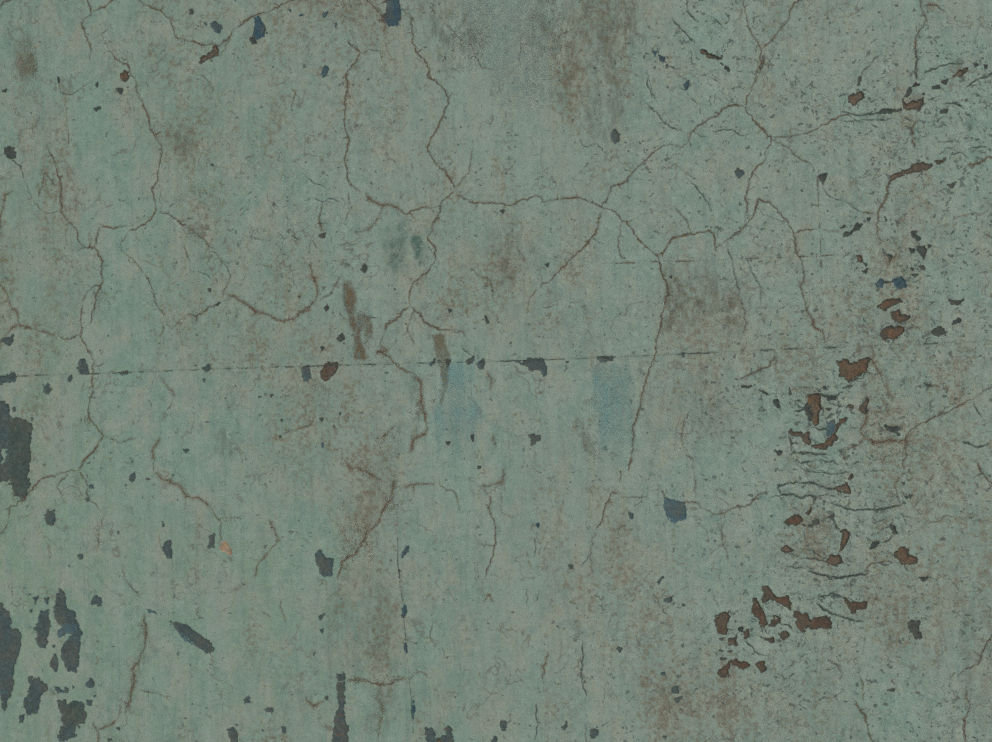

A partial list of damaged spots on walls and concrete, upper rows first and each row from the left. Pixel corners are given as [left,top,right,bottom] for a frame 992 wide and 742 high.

crack [0,0,192,528]
crack [147,0,992,626]
flaking render [875,230,931,341]
peeling [0,401,33,500]
flaking render [788,386,869,450]
peeling [0,603,22,711]
peeling [29,588,83,674]
peeling [19,676,96,742]
crack [98,619,149,738]
crack [353,678,412,714]
flaking render [714,586,832,678]
crack [806,656,872,741]